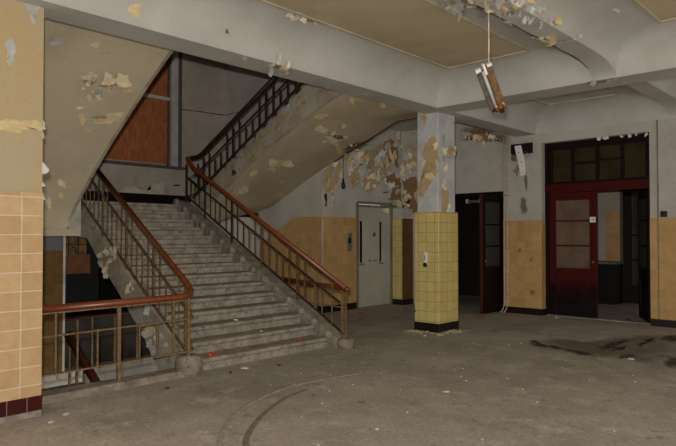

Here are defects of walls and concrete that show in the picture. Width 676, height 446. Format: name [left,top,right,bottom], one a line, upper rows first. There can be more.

peeling [438,0,583,47]
peeling [5,38,17,68]
peeling [268,52,290,77]
peeling [77,72,134,132]
peeling [0,119,46,138]
peeling [313,114,457,215]
peeling [97,245,118,279]
flaking render [141,325,168,356]